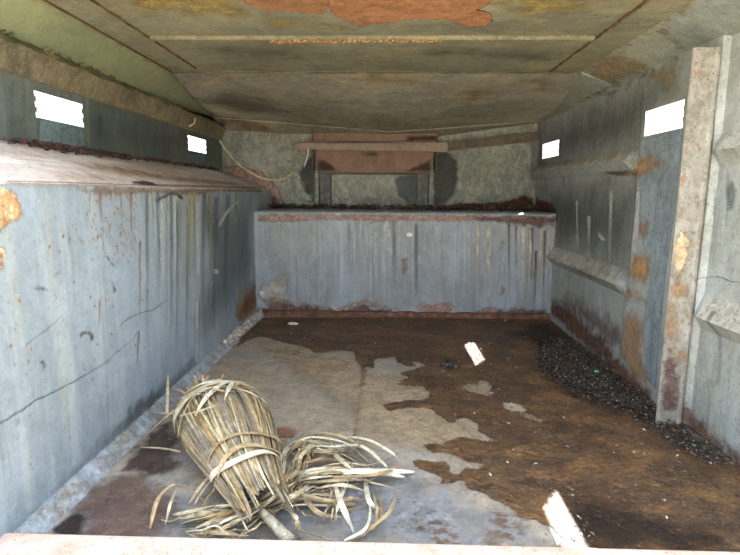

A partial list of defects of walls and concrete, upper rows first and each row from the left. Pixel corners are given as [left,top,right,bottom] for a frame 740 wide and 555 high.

peeling [244,0,493,27]
corrosion [8,166,557,270]
corrosion [629,256,649,283]
corrosion [673,232,691,296]
crack [0,300,166,424]
corrosion [237,291,740,552]